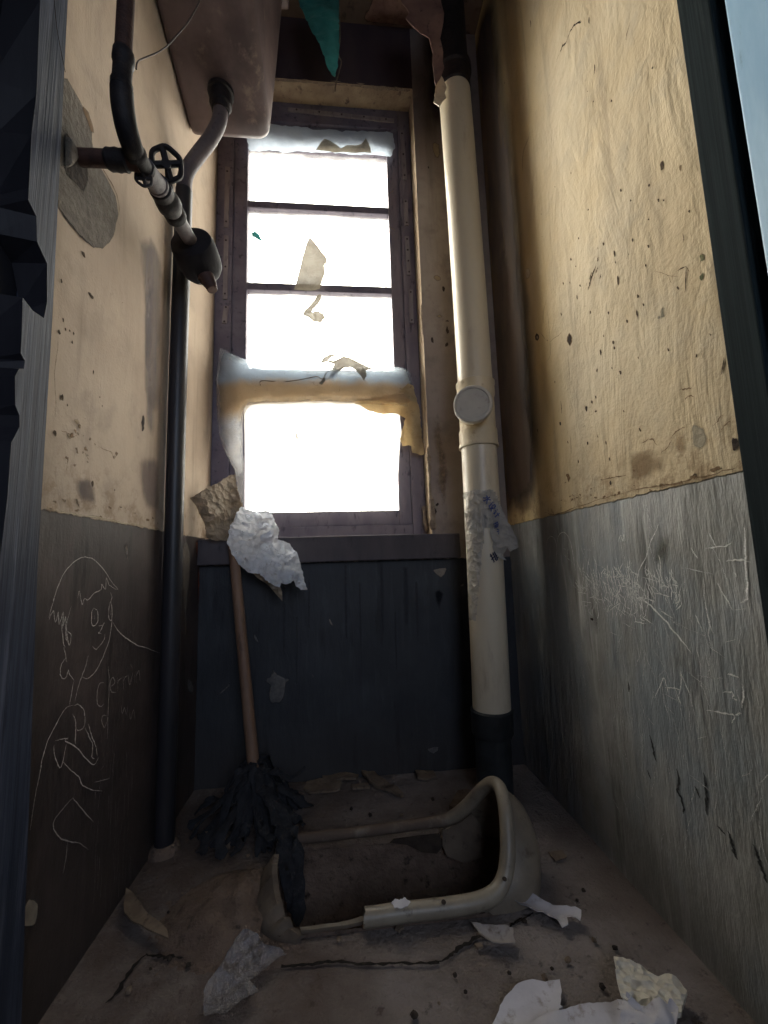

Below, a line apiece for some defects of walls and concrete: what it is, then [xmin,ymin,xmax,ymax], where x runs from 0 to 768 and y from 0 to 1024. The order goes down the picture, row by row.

damp [632,454,659,475]
crack [509,912,533,927]
crack [281,935,485,968]
crack [106,953,183,1003]